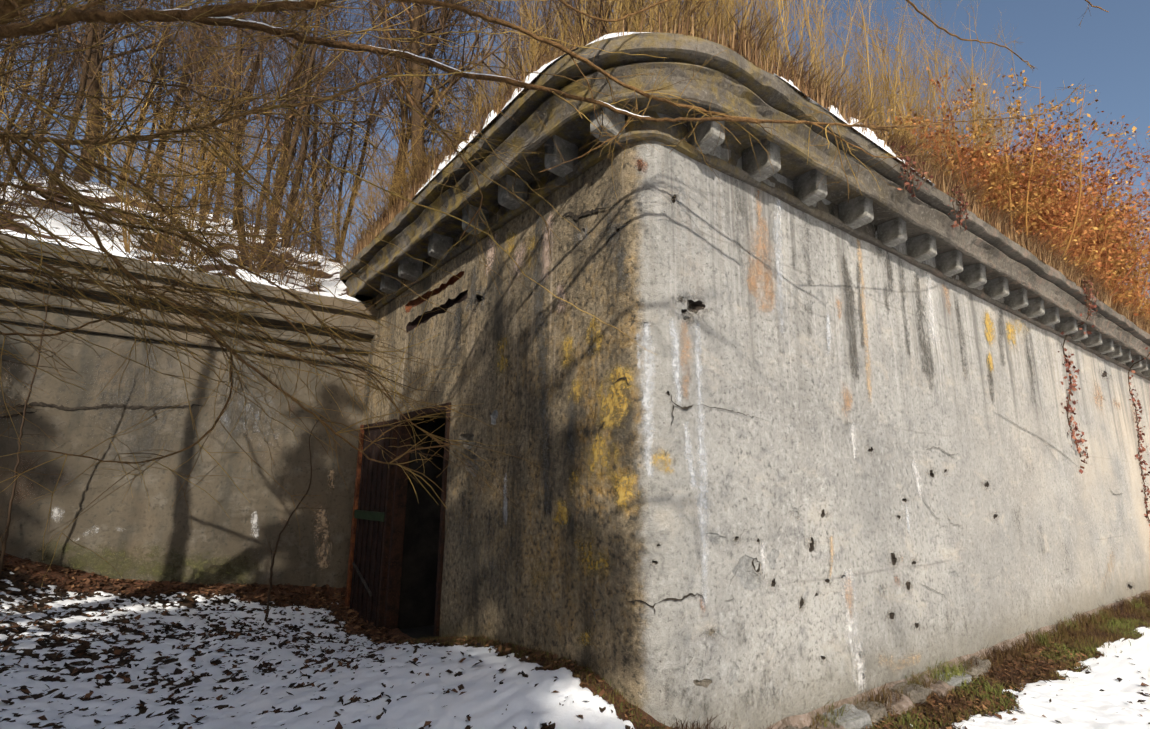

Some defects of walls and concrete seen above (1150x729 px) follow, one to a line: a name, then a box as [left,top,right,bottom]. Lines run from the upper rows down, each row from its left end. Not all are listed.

hole [678,296,708,323]
damp [842,256,864,377]
damp [875,233,935,390]
crack [0,402,203,419]
efflorescence [639,324,652,474]
efflorescence [670,321,681,401]
crack [670,393,766,426]
efflorescence [685,336,707,573]
crack [629,529,747,612]